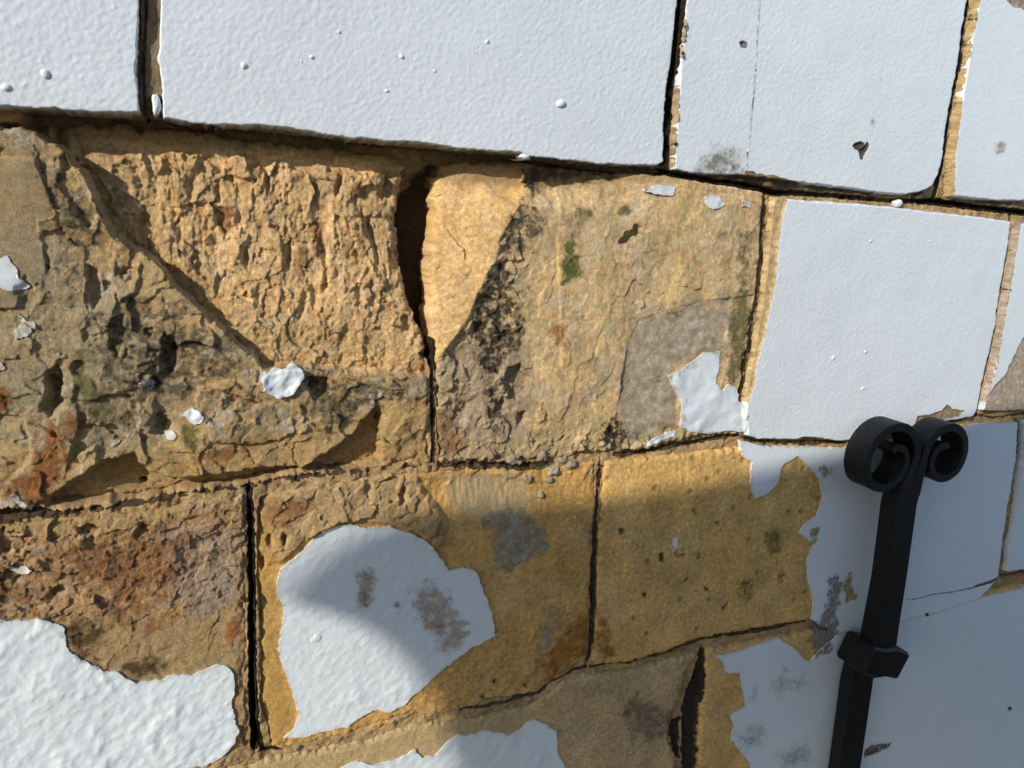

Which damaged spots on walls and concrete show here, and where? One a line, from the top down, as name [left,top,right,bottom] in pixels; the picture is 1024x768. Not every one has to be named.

spalling [37,124,526,400]
crack [139,0,1024,396]
rust [2,412,83,504]
peeling [0,618,239,768]
crack [0,335,549,751]
peeling [276,524,495,738]
crack [459,434,844,768]
peeling [644,197,883,768]
damp [844,572,857,602]
peeling [860,223,1024,768]
crack [908,558,1024,600]
crack [947,412,1024,454]